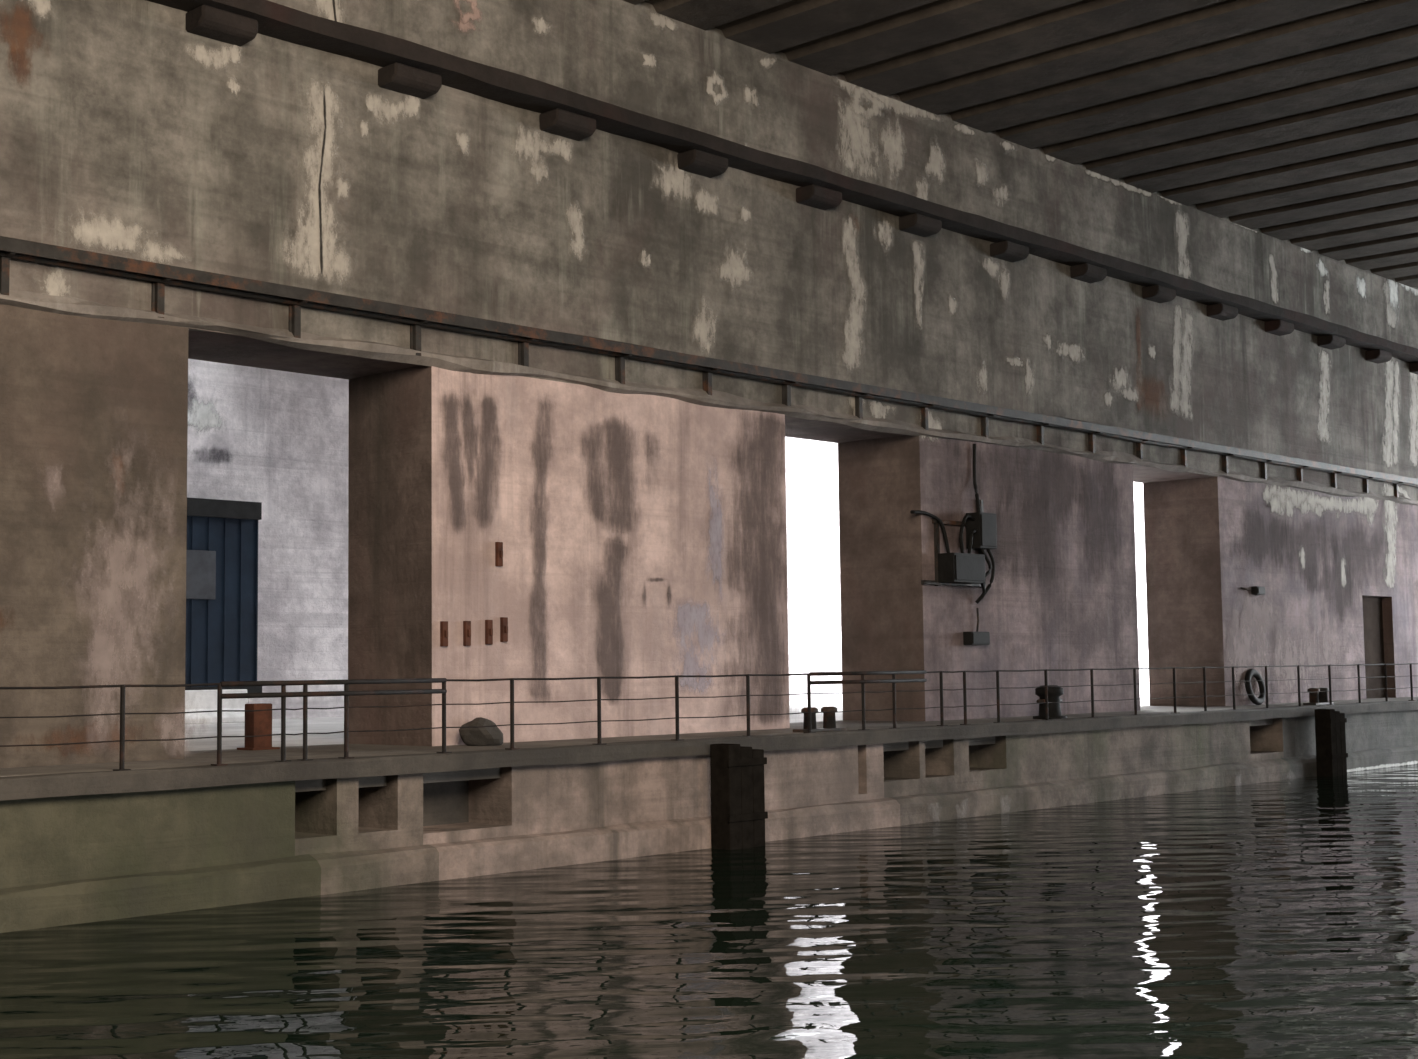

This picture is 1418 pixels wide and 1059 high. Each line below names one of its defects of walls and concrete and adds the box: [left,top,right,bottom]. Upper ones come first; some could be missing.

efflorescence [842,217,866,371]
efflorescence [874,221,893,250]
efflorescence [1158,195,1191,279]
efflorescence [1170,305,1193,419]
water stain [1269,254,1279,304]
water stain [1383,280,1397,328]
water stain [444,398,499,528]
water stain [1243,351,1418,620]
water stain [531,434,550,695]
water stain [589,421,631,701]